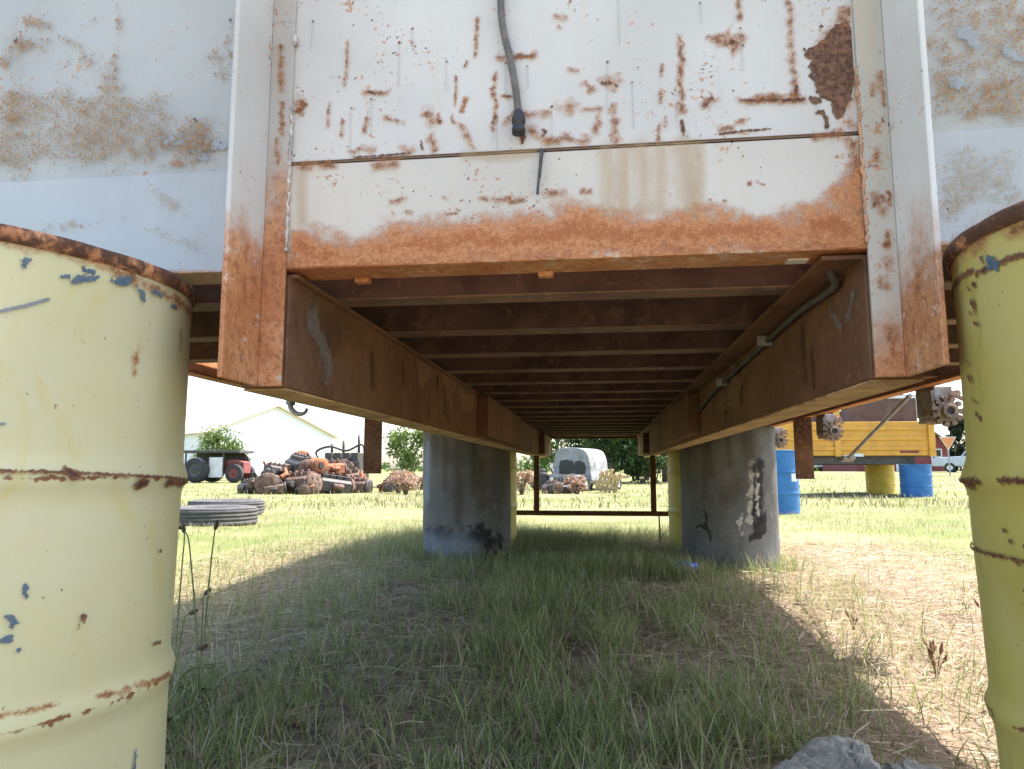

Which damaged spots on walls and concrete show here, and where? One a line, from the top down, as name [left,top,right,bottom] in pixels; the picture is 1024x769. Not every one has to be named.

spalling [736,458,760,536]